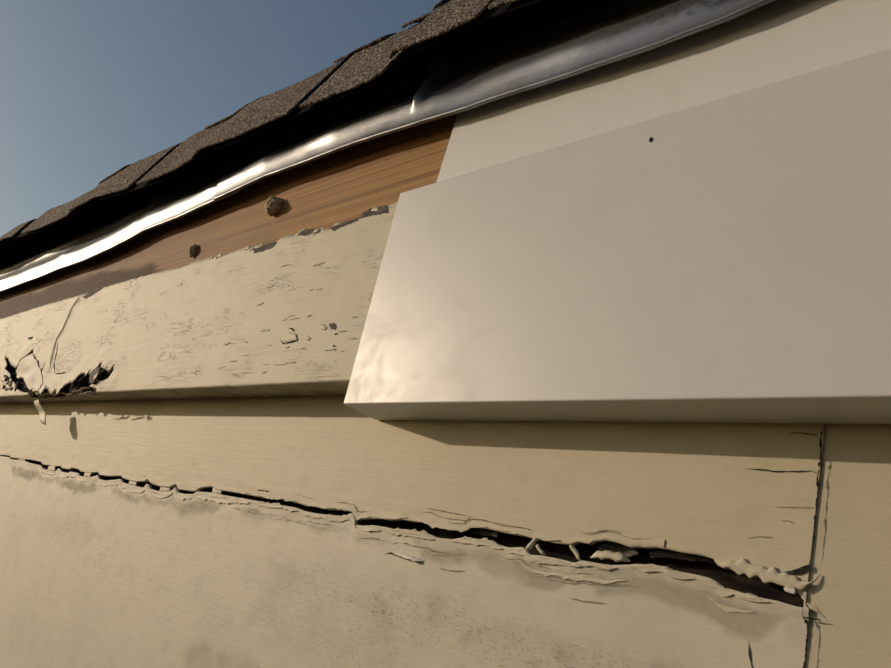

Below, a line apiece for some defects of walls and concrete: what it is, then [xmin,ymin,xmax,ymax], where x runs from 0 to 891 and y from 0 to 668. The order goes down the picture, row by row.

peeling [295,205,388,236]
peeling [244,242,276,253]
peeling [268,315,311,349]
peeling [320,323,357,367]
peeling [3,354,46,425]
peeling [385,552,424,563]
crack [3,424,825,668]